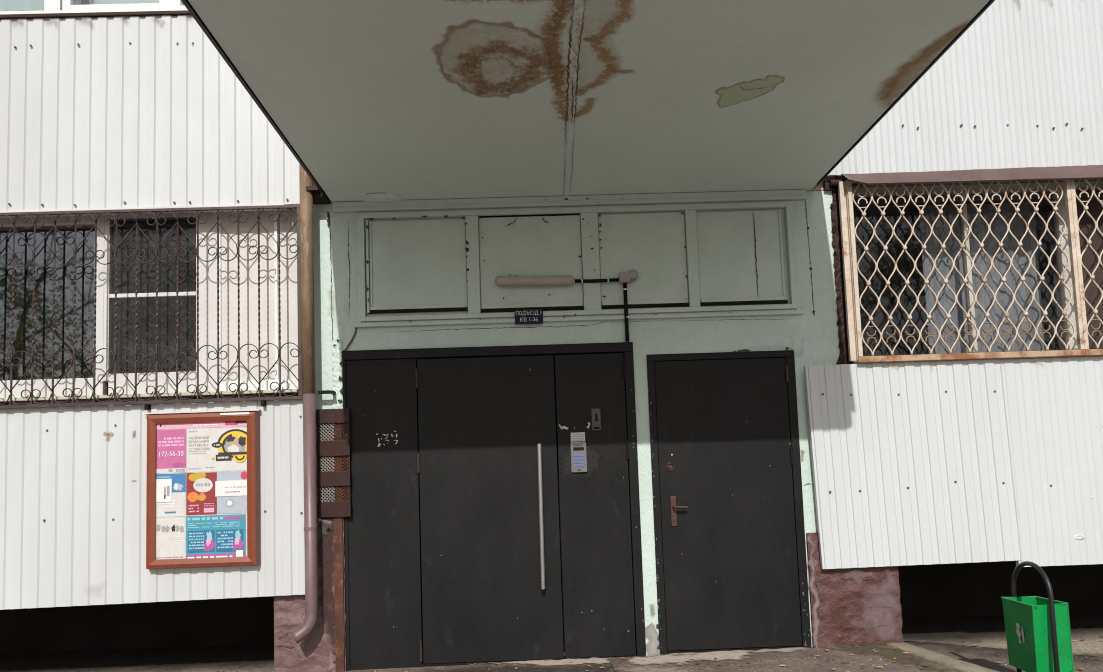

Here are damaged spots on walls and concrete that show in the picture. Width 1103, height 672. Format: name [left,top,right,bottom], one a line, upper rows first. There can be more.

crack [563,0,585,196]
corrosion [541,0,633,121]
peeling [716,75,785,108]
corrosion [882,25,965,104]